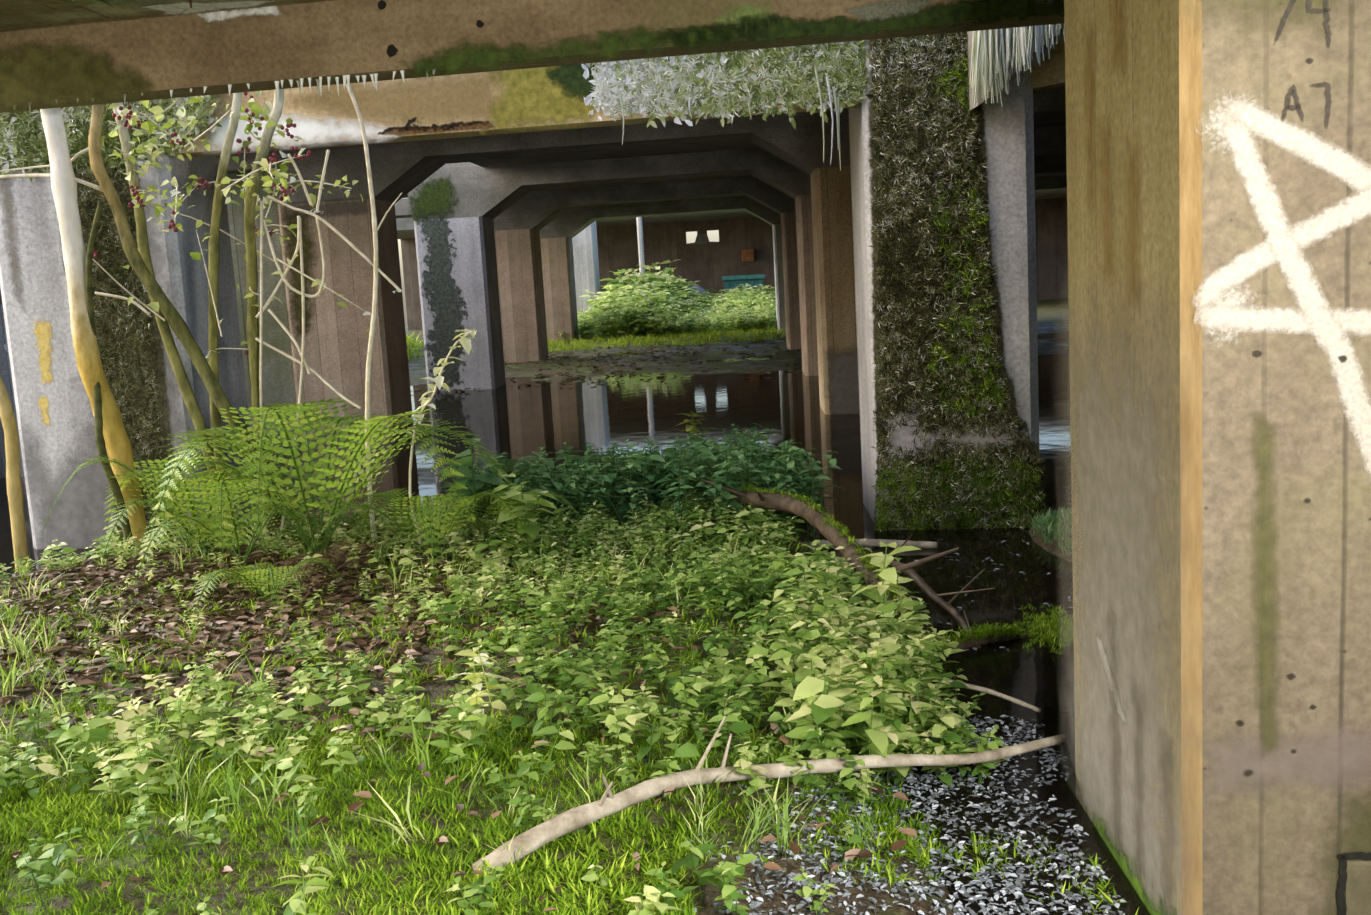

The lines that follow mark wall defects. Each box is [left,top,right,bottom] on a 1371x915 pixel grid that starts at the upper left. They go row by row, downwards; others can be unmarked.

damp [0,0,323,31]
damp [717,5,767,24]
damp [846,0,931,20]
damp [1221,420,1371,783]